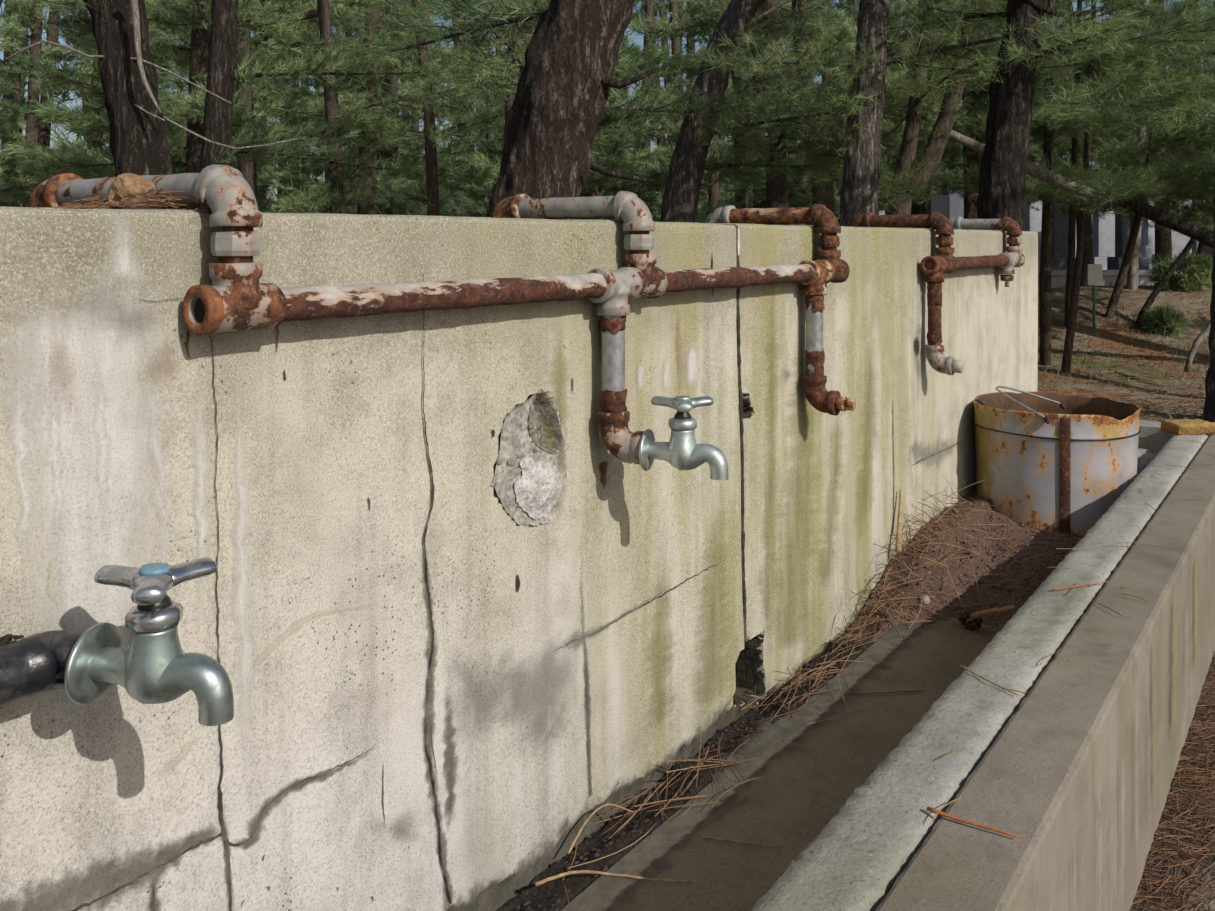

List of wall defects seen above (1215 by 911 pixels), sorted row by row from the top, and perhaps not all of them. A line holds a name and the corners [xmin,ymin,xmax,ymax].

damp [115,231,139,278]
damp [10,296,167,640]
damp [195,419,208,558]
crack [211,336,221,664]
spalling [490,388,568,526]
corrosion [600,461,608,487]
crack [560,254,747,648]
damp [234,432,252,718]
crack [423,311,452,905]
crack [180,725,240,864]
crack [275,750,385,822]
crack [70,883,130,911]